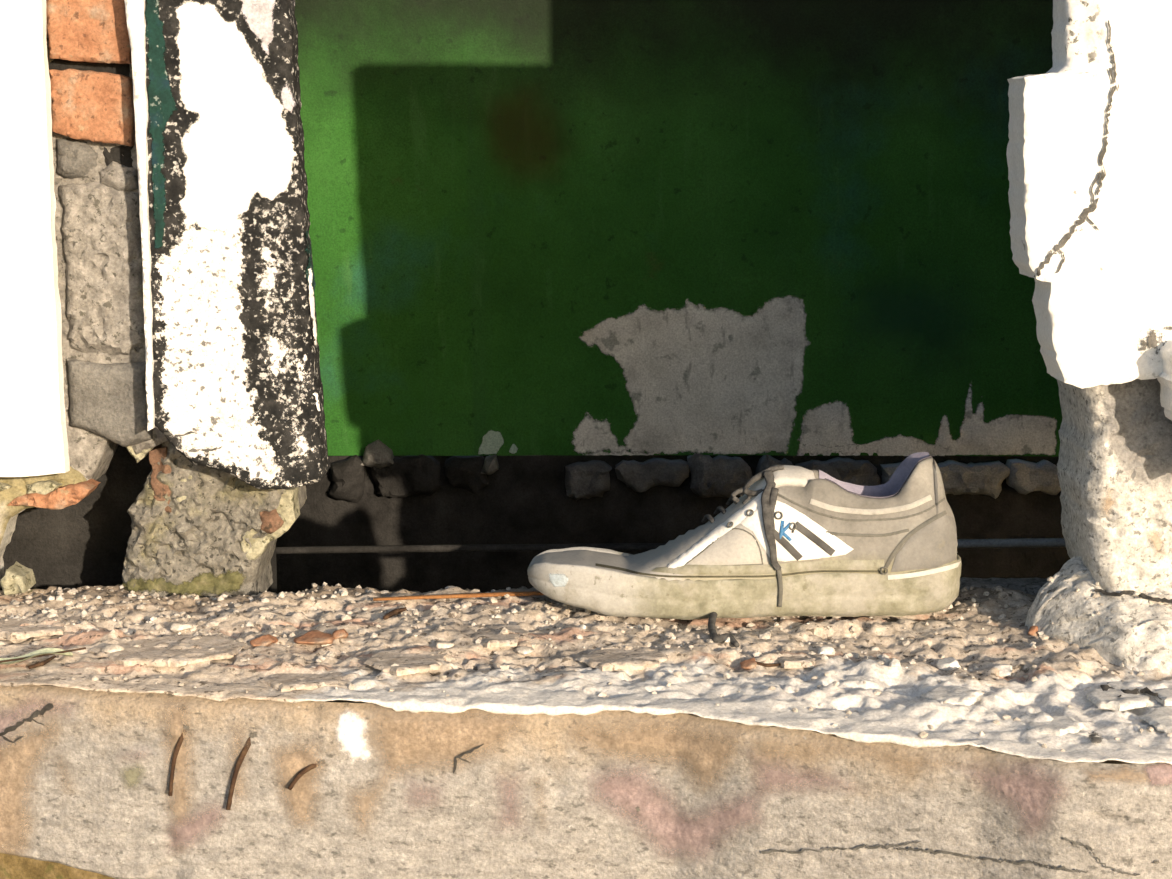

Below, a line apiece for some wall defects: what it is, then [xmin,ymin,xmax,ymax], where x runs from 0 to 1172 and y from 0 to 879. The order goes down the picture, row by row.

peeling [126,0,320,561]